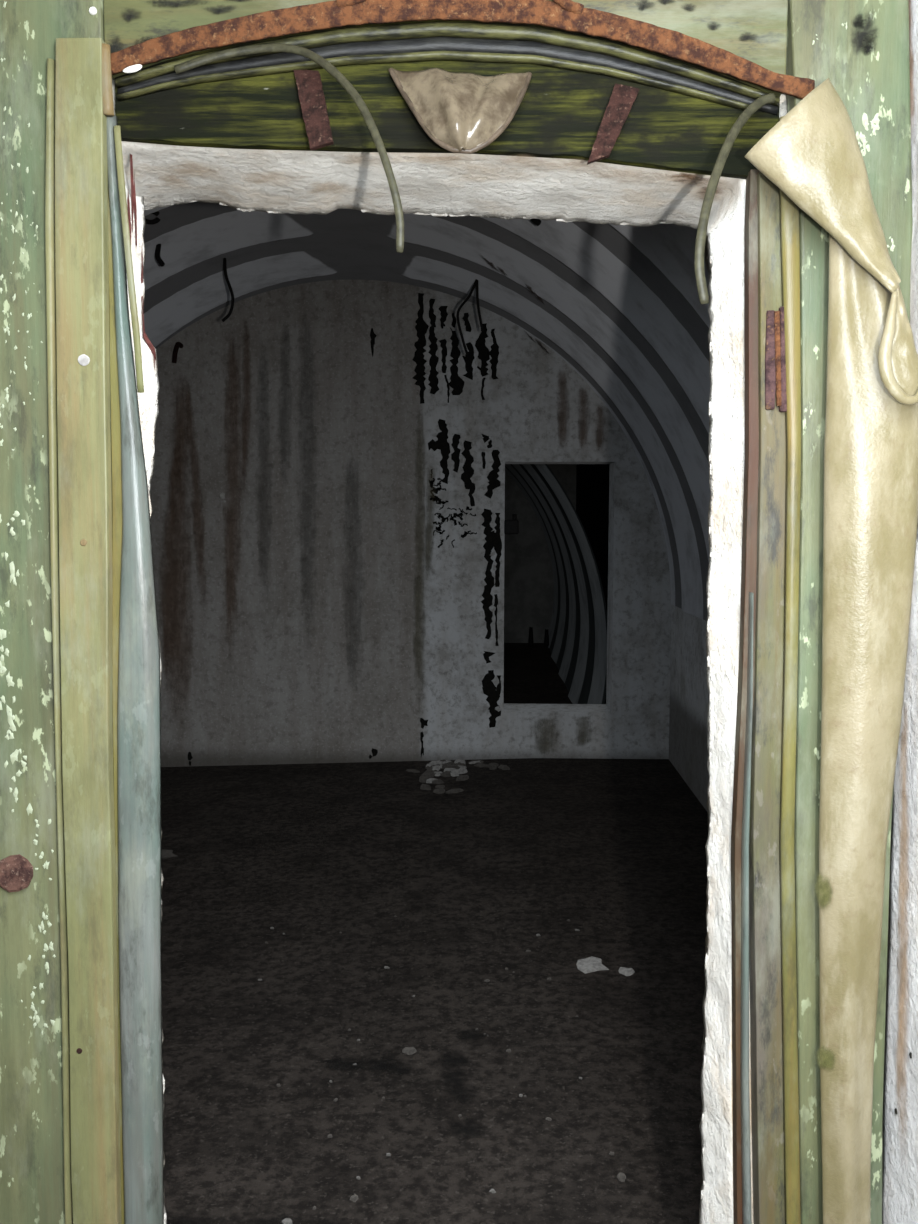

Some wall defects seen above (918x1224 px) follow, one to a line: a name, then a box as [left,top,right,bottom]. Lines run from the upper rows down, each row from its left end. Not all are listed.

peeling [856,113,880,156]
peeling [0,194,43,451]
peeling [412,293,499,404]
peeling [0,511,25,536]
peeling [5,552,20,585]
peeling [428,419,502,728]
peeling [0,629,54,881]
peeling [21,912,56,1035]